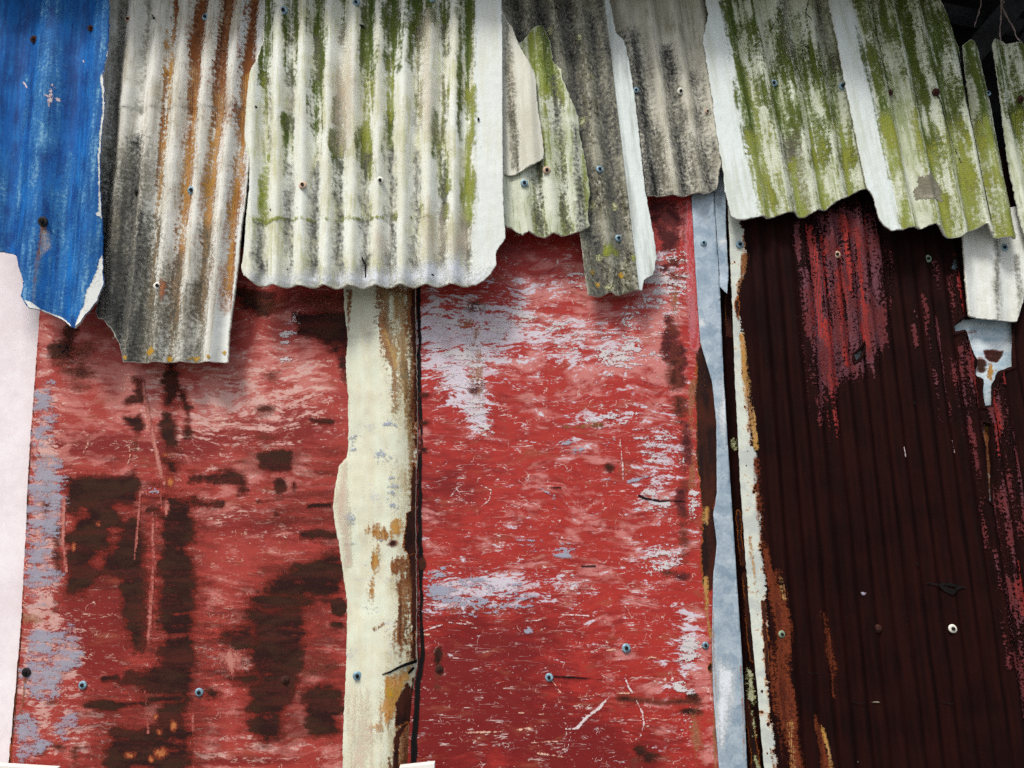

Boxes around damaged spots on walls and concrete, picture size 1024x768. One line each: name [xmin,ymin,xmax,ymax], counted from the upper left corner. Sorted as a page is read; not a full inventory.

rust [150,0,352,382]
water stain [251,0,475,287]
peeling [421,246,691,437]
water stain [505,0,717,296]
water stain [742,0,858,217]
peeling [792,200,893,438]
water stain [871,0,1024,318]
rust [45,363,297,768]
rust [220,529,347,747]
rust [364,285,443,768]
peeling [672,628,702,695]
peeling [911,294,1024,724]